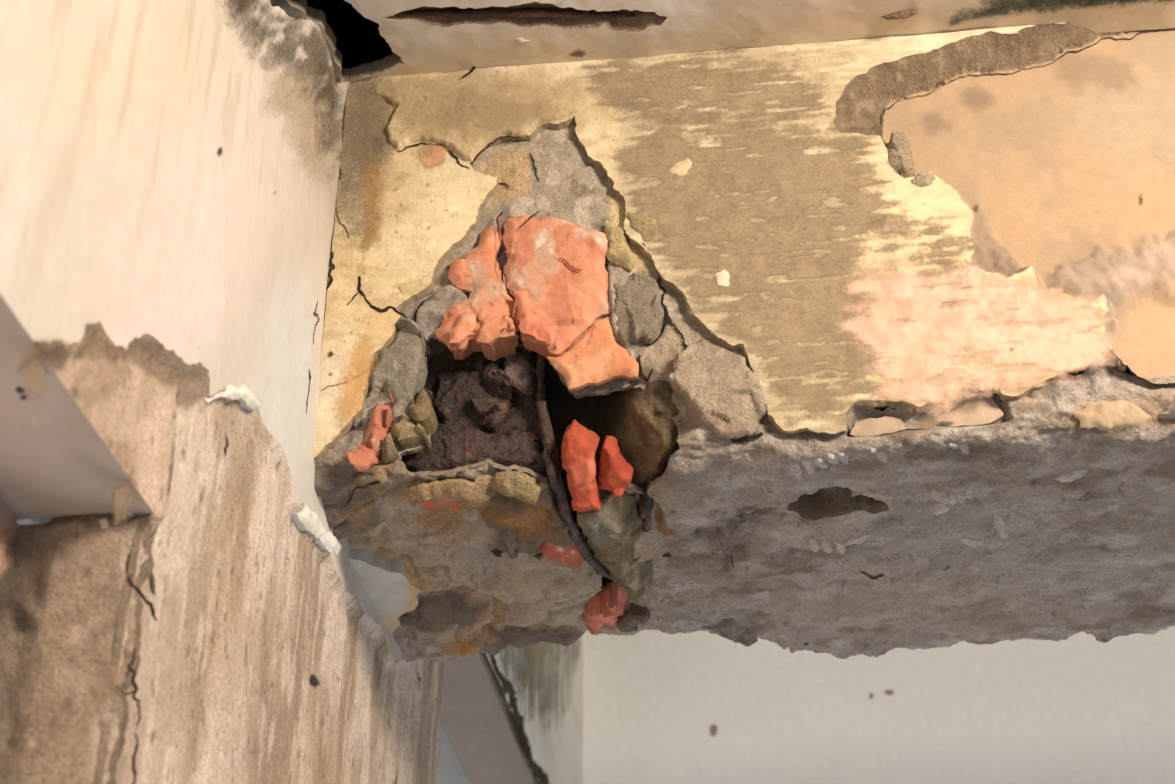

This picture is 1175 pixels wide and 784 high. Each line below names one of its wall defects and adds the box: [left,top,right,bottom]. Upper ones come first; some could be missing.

leakage [228,0,390,247]
crack [306,208,433,413]
crack [397,135,539,182]
spalling [386,2,667,44]
crack [637,277,687,382]
leakage [584,47,908,425]
spalling [373,22,1175,659]
spalling [882,8,918,20]
leakage [910,223,980,276]
crack [128,395,178,621]
spalling [0,321,647,784]
crack [115,648,141,784]